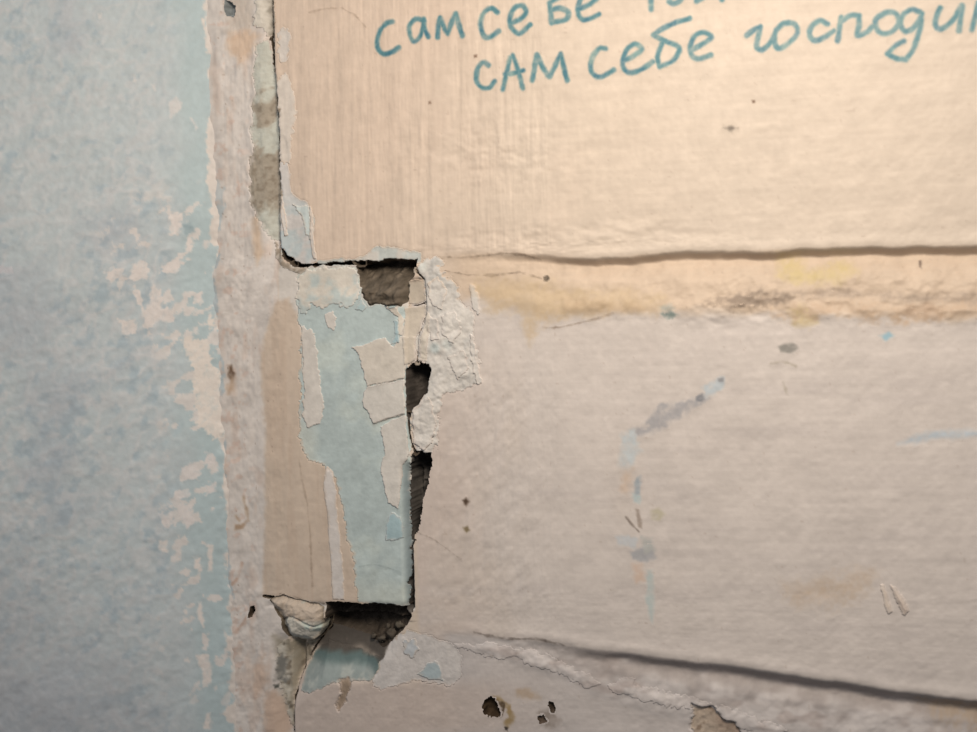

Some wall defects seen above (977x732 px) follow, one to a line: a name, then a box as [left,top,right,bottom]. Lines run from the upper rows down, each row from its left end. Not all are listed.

spalling [224,0,236,17]
crack [268,4,276,70]
peeling [102,211,198,337]
peeling [248,0,482,606]
peeling [156,290,225,554]
crack [262,249,543,730]
peeling [275,629,462,726]
spalling [691,704,741,732]